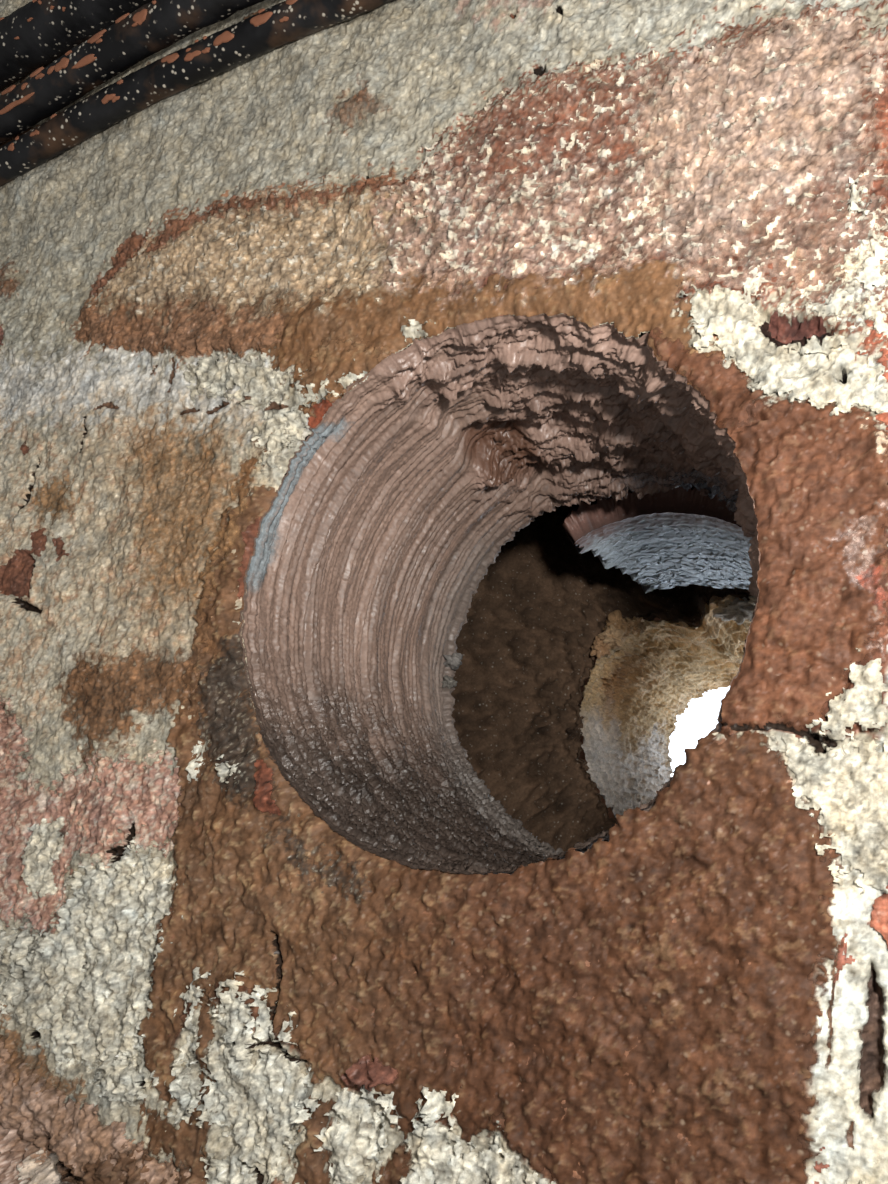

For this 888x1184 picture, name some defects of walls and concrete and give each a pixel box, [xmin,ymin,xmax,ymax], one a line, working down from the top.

peeling [677,63,888,435]
peeling [401,316,436,342]
peeling [181,348,368,478]
spalling [0,528,69,599]
spalling [237,516,262,599]
crack [721,721,838,754]
peeling [771,648,888,949]
crack [245,929,308,1063]
peeling [0,695,556,1184]
spalling [833,933,855,983]
crack [825,947,886,1149]
spalling [814,1147,830,1184]